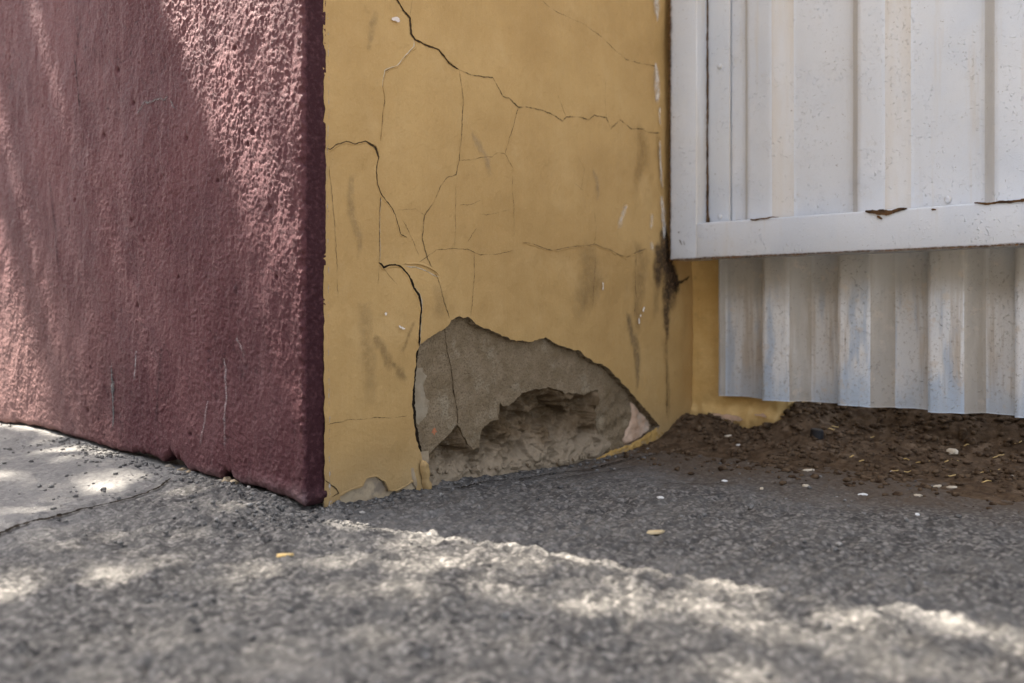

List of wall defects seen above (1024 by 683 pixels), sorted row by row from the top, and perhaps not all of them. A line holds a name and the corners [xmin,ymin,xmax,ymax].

crack [328,0,658,452]
rust [865,208,907,219]
spalling [412,316,663,486]
peeling [340,475,416,503]